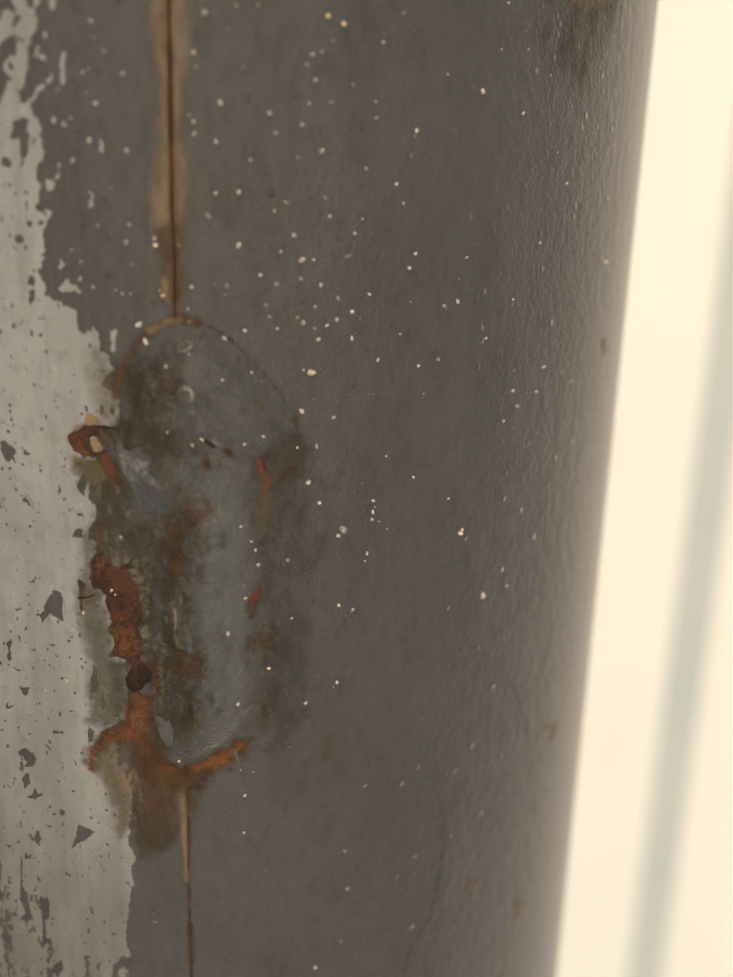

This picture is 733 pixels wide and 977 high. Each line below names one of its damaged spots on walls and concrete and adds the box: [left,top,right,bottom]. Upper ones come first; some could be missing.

corrosion [106,0,230,399]
crack [167,0,176,319]
peeling [0,440,16,462]
spalling [68,406,117,457]
peeling [40,590,66,622]
spalling [79,547,153,720]
corrosion [83,601,251,831]
peeling [18,748,42,799]
peeling [72,825,97,847]
crack [182,766,190,877]
peeling [20,857,50,948]
peeling [52,960,63,977]